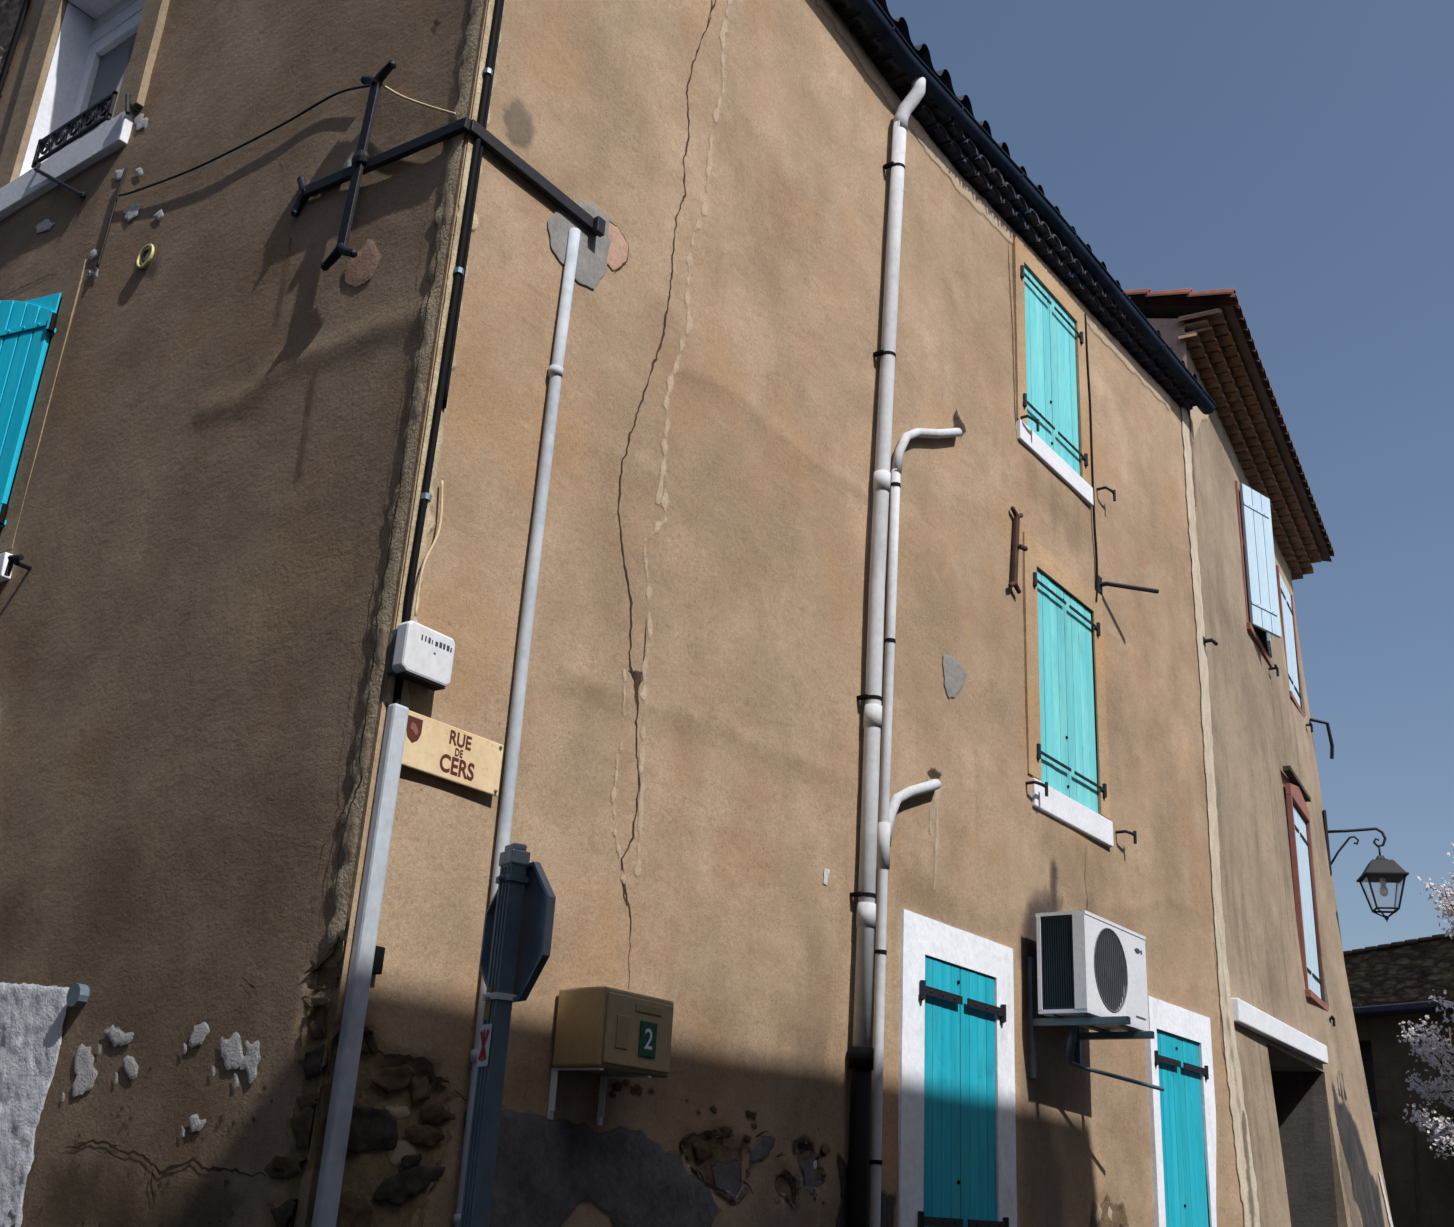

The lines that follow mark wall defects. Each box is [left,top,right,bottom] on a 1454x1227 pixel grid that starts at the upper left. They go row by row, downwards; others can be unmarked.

crack [611,0,732,982]
peeling [264,0,505,1227]
peeling [62,1025,151,1102]
peeling [183,1022,272,1103]
crack [65,1139,266,1204]
peeling [181,1114,255,1141]
flaking render [680,1100,830,1210]
flaking render [1091,1193,1129,1227]